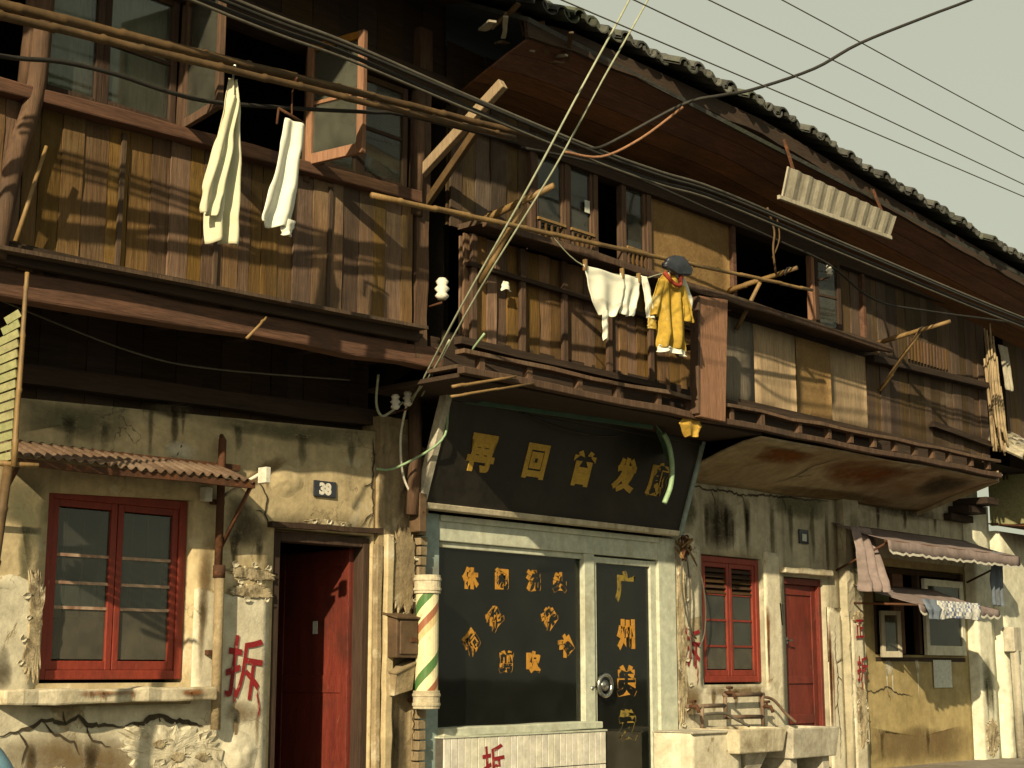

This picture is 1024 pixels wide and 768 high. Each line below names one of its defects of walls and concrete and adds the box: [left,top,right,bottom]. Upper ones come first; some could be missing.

leakage [31,408,119,438]
leakage [150,405,190,457]
rust [761,449,807,462]
leakage [686,501,750,542]
peeling [226,561,276,602]
peeling [17,569,46,685]
crack [0,712,203,765]
peeling [117,720,227,768]